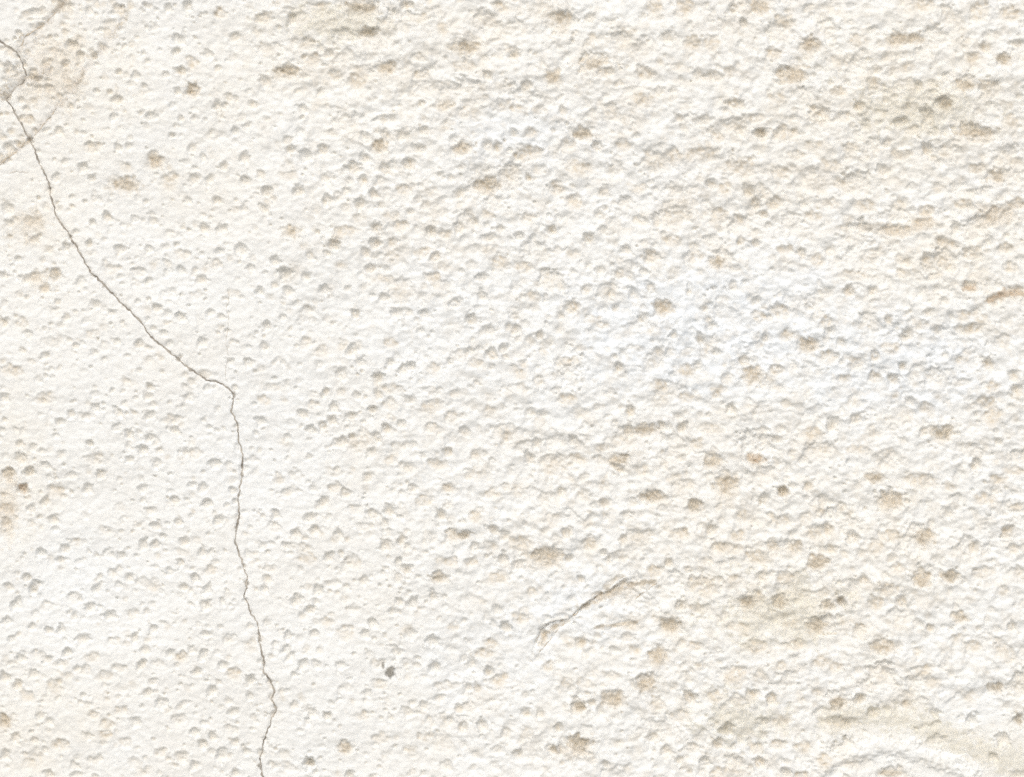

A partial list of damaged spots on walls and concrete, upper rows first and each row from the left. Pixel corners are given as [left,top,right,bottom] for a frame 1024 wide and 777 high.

crack [0,2,277,777]